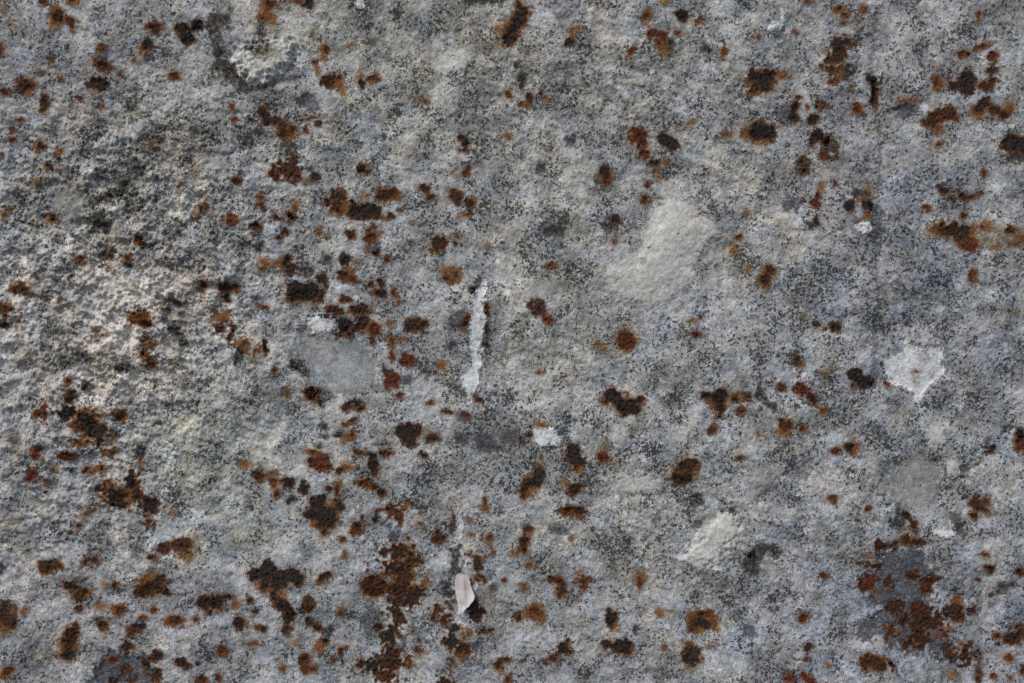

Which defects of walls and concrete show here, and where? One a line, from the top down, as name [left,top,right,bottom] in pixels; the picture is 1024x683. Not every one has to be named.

rust [816,3,869,115]
rust [920,41,1015,152]
rust [627,127,681,204]
rust [722,94,840,231]
rust [922,181,1024,253]
rust [257,185,429,399]
rust [25,376,176,530]
rust [600,387,646,417]
rust [700,388,752,436]
rust [37,398,535,683]
rust [632,564,722,673]
rust [846,530,1024,683]